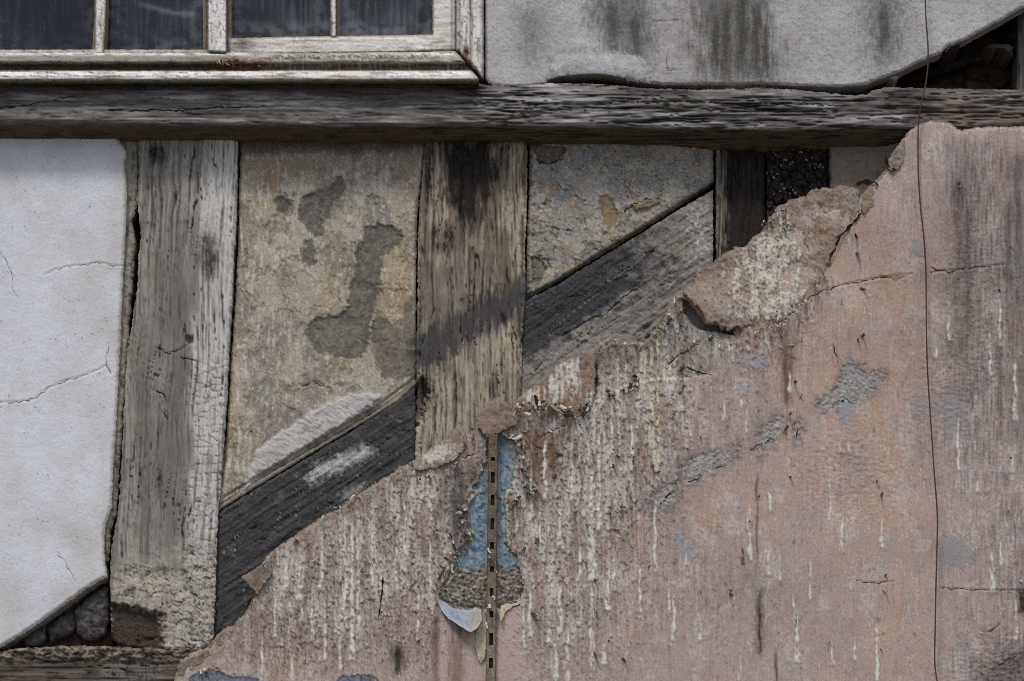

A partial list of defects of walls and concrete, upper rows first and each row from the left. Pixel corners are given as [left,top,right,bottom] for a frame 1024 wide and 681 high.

leakage [706,0,767,73]
crack [807,213,1004,300]
crack [8,346,111,403]
peeling [406,395,593,663]